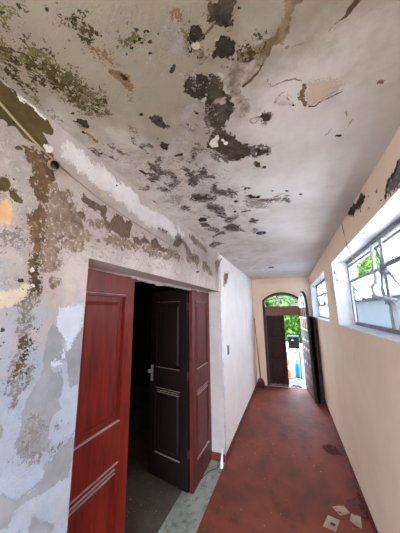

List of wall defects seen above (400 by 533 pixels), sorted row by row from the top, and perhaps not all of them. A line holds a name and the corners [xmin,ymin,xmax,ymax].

water stain [0,143,73,403]
water stain [0,0,244,236]
peeling [60,0,311,293]
peeling [267,76,345,107]
flaking render [347,192,370,217]
flaking render [380,157,400,201]
peeling [0,302,85,530]